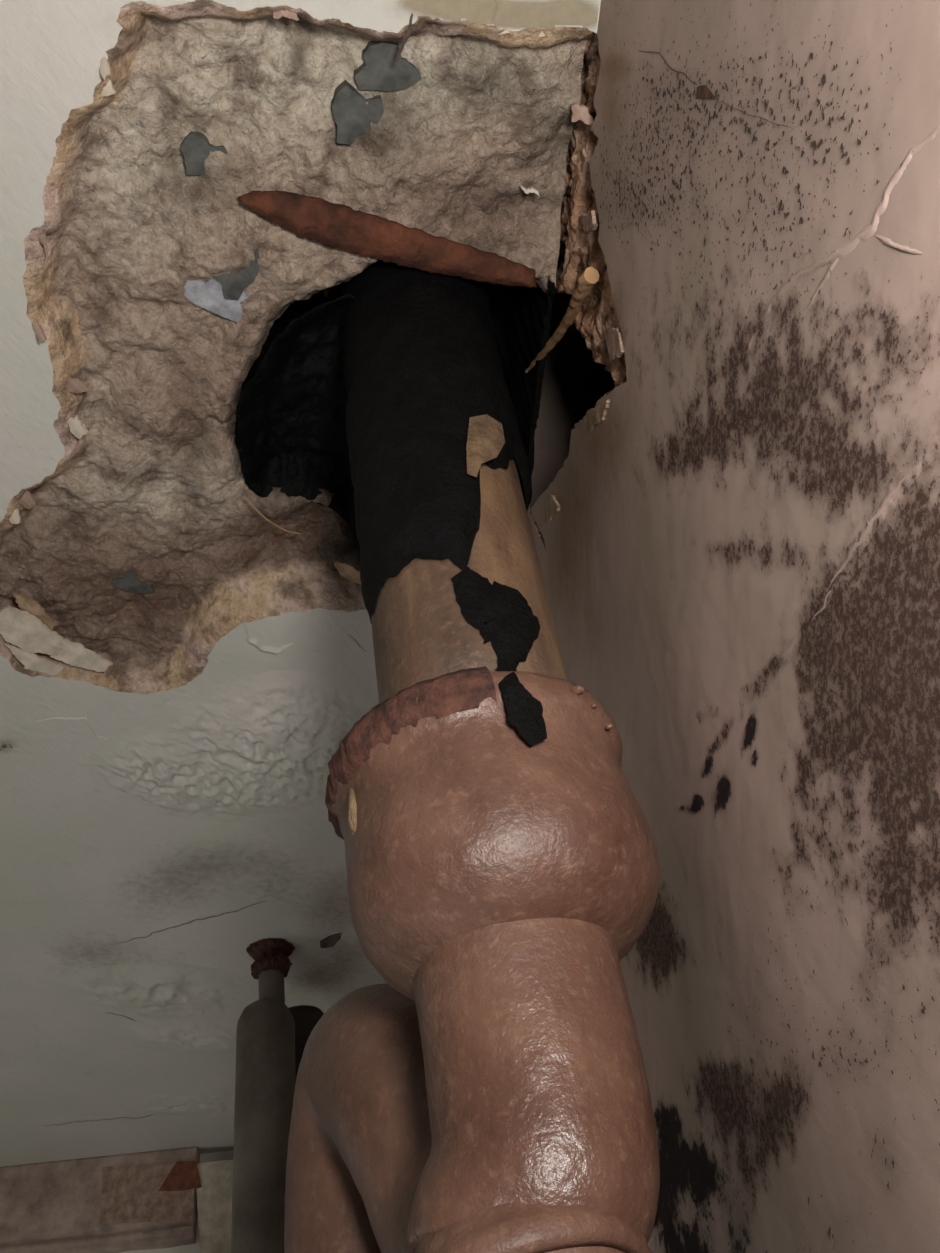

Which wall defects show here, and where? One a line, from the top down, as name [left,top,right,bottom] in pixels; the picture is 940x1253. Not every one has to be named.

spalling [0,0,627,694]
rust [238,191,537,288]
damp [590,0,940,1253]